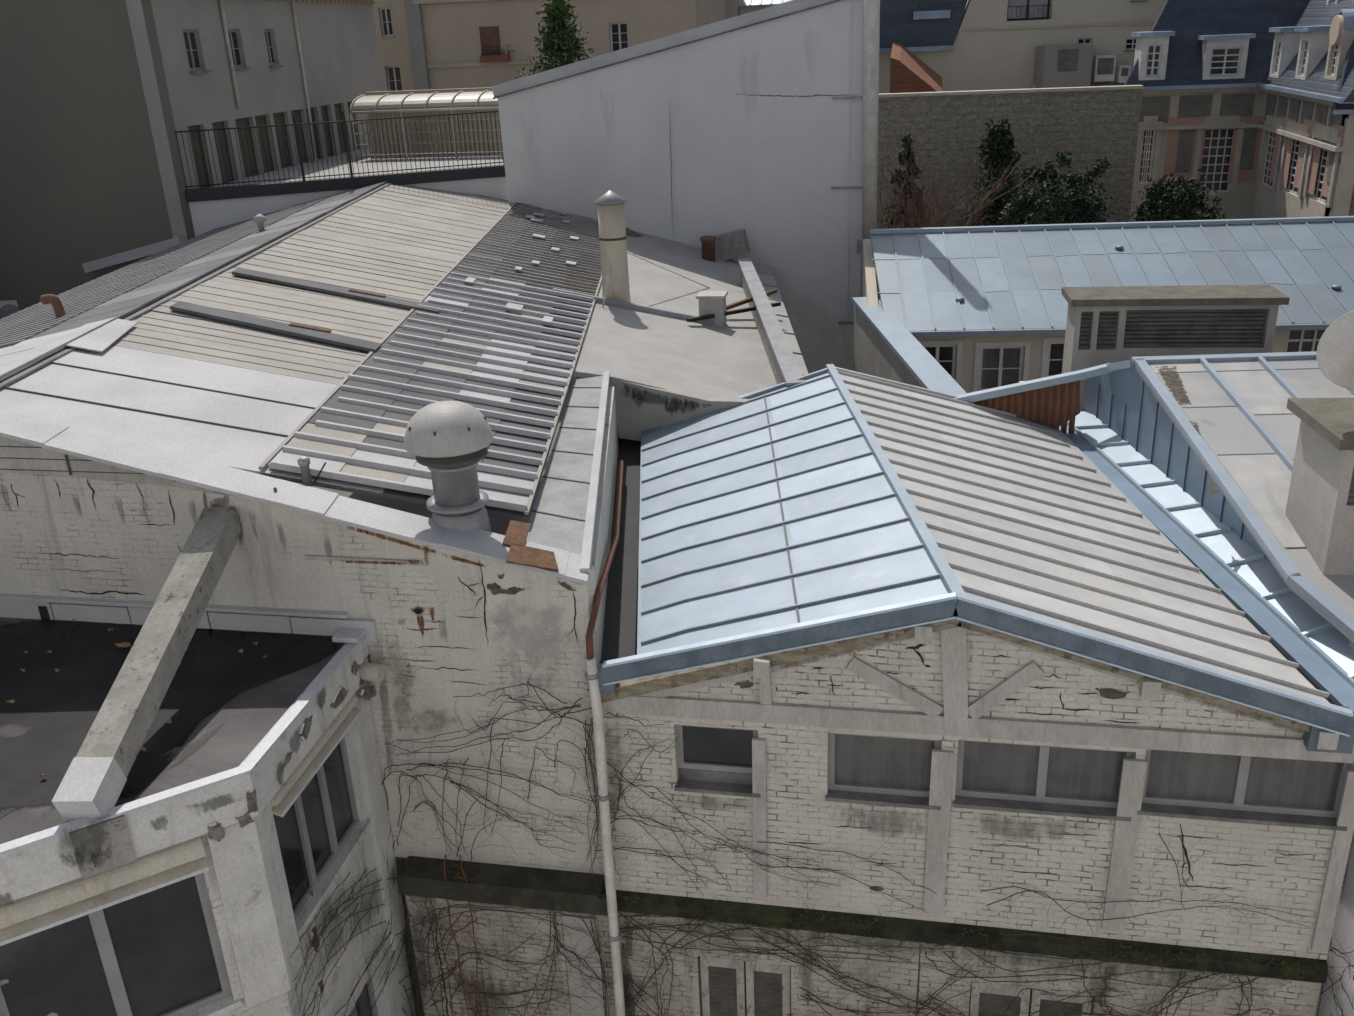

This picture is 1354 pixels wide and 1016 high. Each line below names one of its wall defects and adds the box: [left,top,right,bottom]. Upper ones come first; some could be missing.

crack [129,484,181,552]
rust [346,527,483,567]
flaking render [487,574,525,595]
rust [411,607,434,637]
peeling [207,789,258,842]
crack [785,826,896,871]
crack [992,832,1098,874]
crack [1169,824,1316,889]